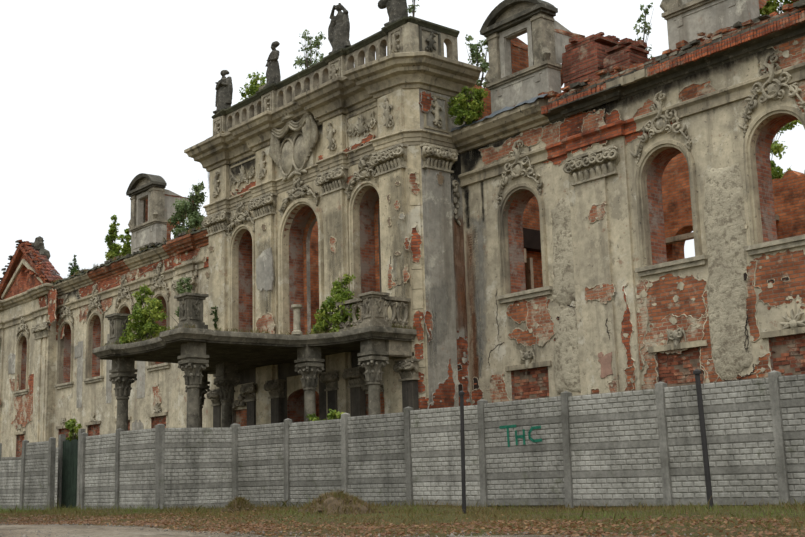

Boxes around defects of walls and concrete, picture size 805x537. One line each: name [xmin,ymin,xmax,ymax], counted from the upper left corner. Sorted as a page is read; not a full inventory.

flaking render [758,36,805,71]
flaking render [419,91,434,113]
flaking render [479,108,621,166]
flaking render [588,202,607,224]
flaking render [387,225,422,289]
flaking render [38,286,65,341]
flaking render [412,310,433,360]
flaking render [506,295,559,347]
flaking render [584,272,772,394]
flaking render [742,248,805,343]
flaking render [418,330,510,410]
flaking render [9,373,34,429]